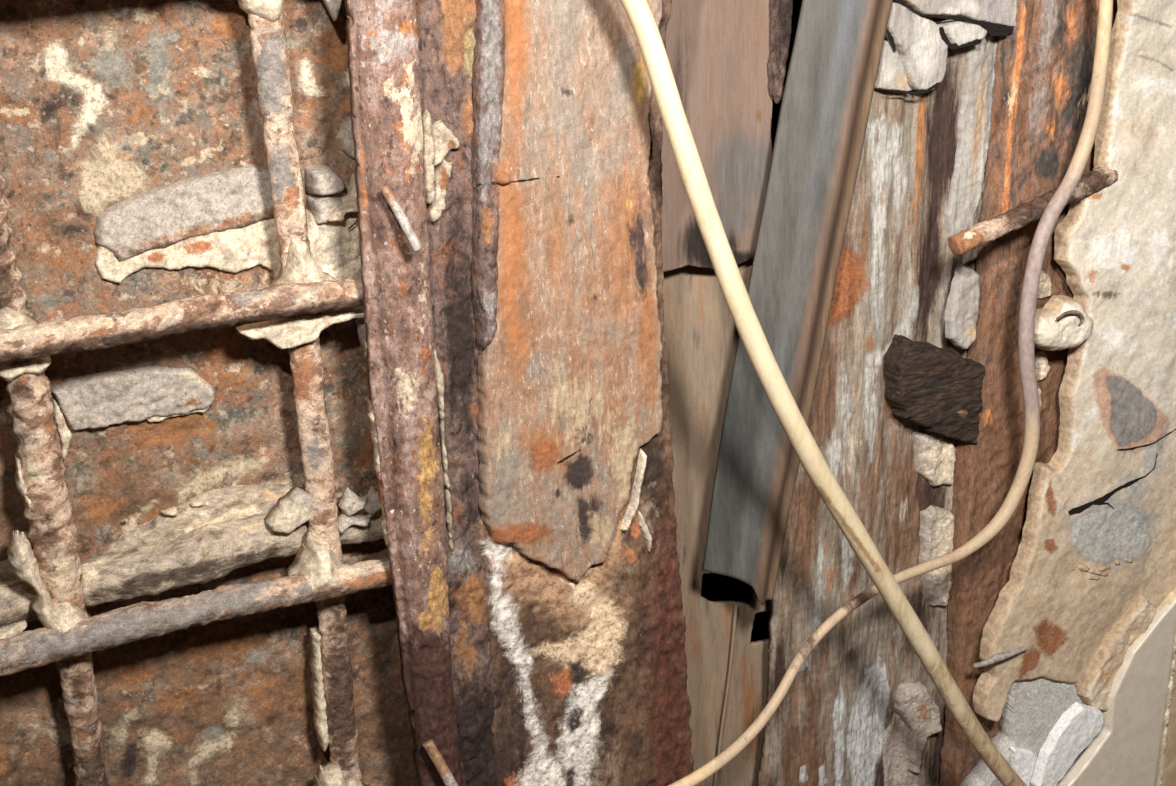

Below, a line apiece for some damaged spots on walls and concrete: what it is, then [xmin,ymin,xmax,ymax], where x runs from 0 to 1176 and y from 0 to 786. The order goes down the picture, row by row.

spalling [875,0,1017,239]
spalling [93,164,281,283]
peeling [236,305,364,349]
corrosion [477,0,663,636]
corrosion [828,250,868,323]
spalling [51,366,215,461]
corrosion [1046,484,1057,515]
crack [1068,429,1176,515]
peeling [309,626,329,752]
water stain [480,537,628,786]
corrosion [1020,619,1067,677]
spalling [1010,702,1104,786]